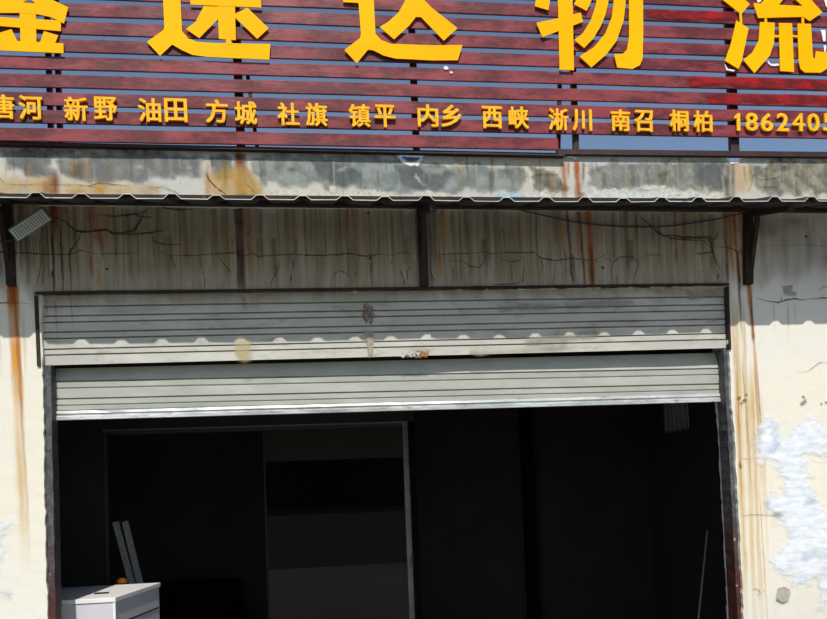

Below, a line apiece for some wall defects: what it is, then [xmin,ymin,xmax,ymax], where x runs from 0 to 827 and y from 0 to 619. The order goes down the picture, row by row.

rust [236,154,245,174]
damp [5,149,567,195]
crack [0,186,485,291]
rust [579,211,594,285]
crack [495,212,827,303]
rust [726,214,754,339]
rust [8,286,21,400]
peeling [754,416,827,610]